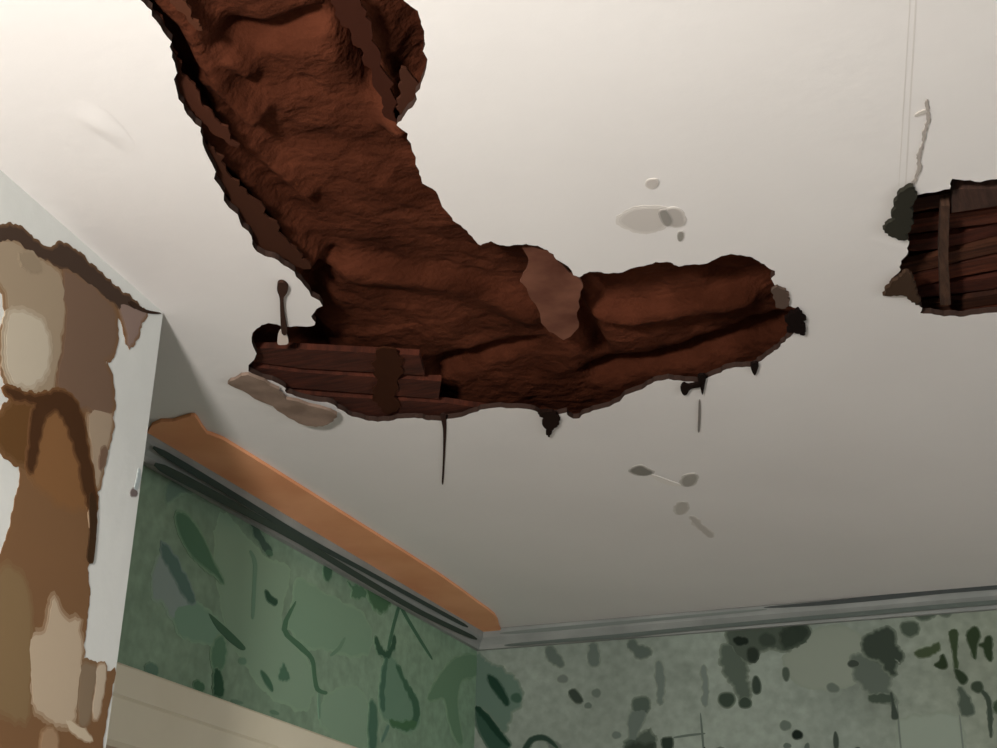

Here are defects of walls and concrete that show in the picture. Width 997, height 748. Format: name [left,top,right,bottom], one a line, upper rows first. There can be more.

peeling [0,222,148,493]
peeling [277,329,289,345]
peeling [0,413,116,748]
mould [475,652,525,733]
water stain [544,645,568,683]
water stain [587,642,601,668]
mould [612,639,667,748]
mould [699,625,812,707]
water stain [849,614,952,707]
water stain [956,686,976,717]